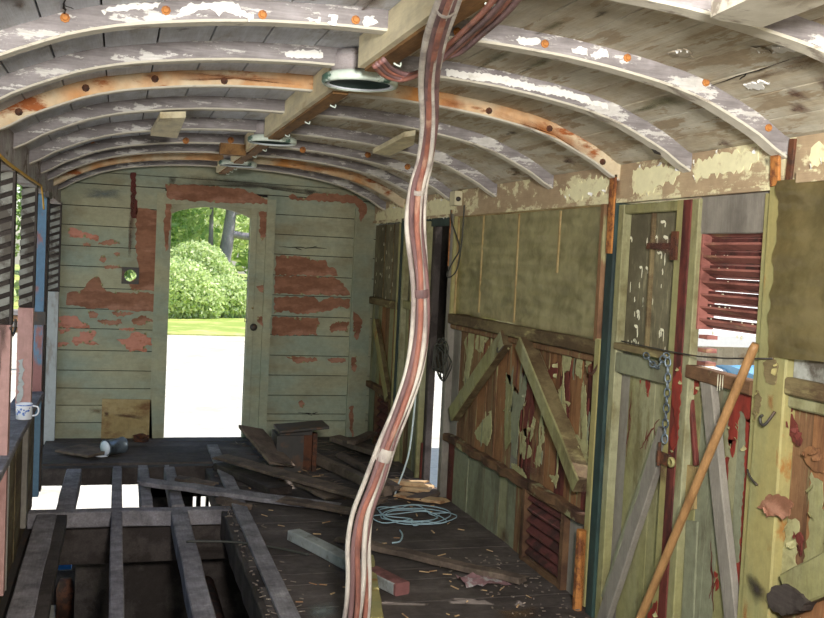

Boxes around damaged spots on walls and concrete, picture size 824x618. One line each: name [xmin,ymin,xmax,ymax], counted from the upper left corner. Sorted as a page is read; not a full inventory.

peeling [101,2,161,15]
peeling [176,1,254,22]
peeling [362,16,378,27]
peeling [285,49,323,59]
crack [711,60,788,86]
peeling [632,162,680,196]
peeling [693,147,760,181]
peeling [809,141,824,169]
peeling [58,172,267,352]
peeling [257,255,362,340]
peeling [503,357,545,478]
peeling [763,472,824,573]